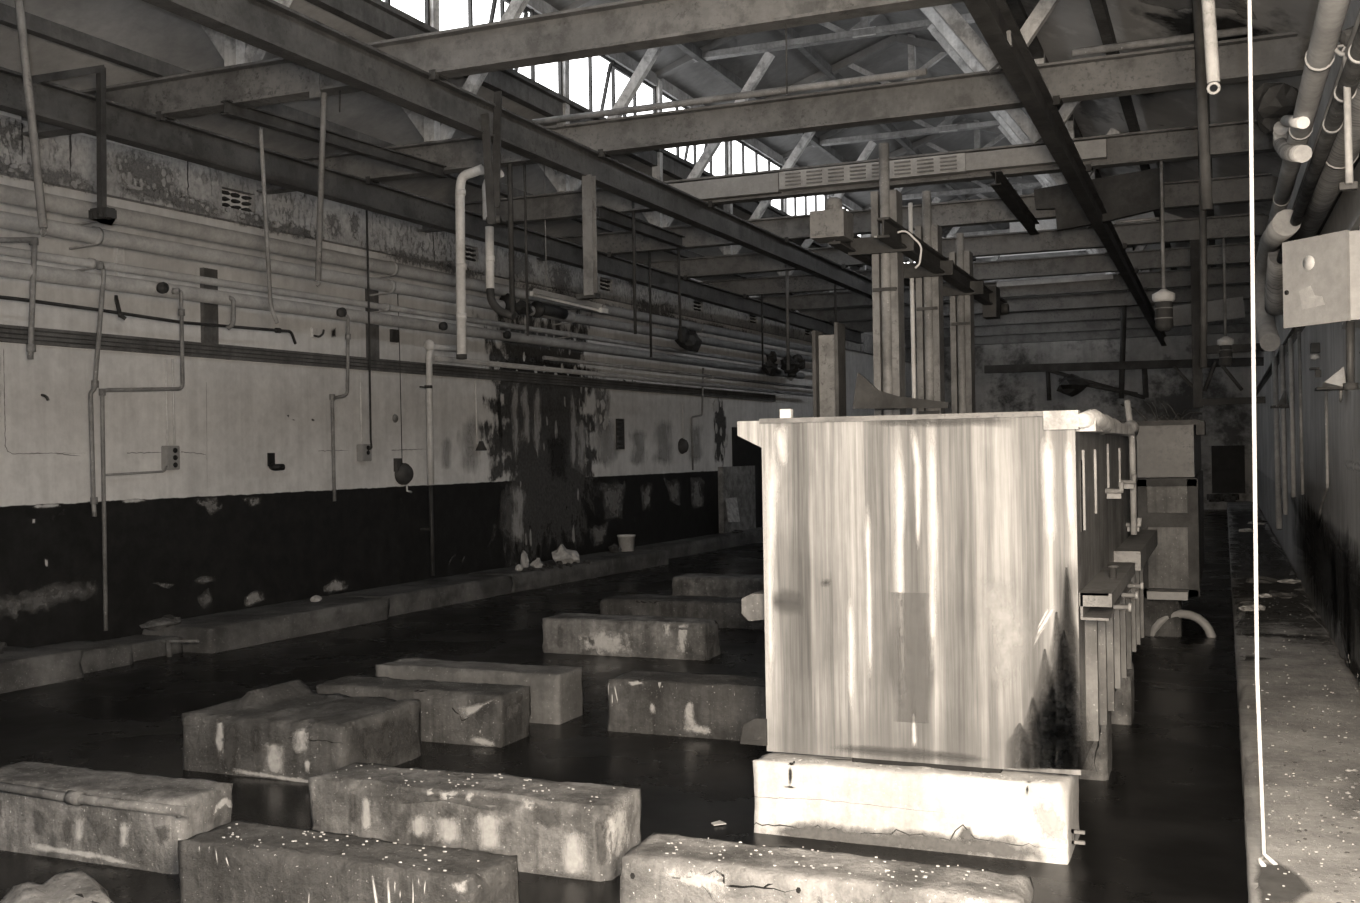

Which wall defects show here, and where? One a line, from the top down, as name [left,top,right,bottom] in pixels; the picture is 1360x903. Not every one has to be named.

leakage [1228,497,1360,661]